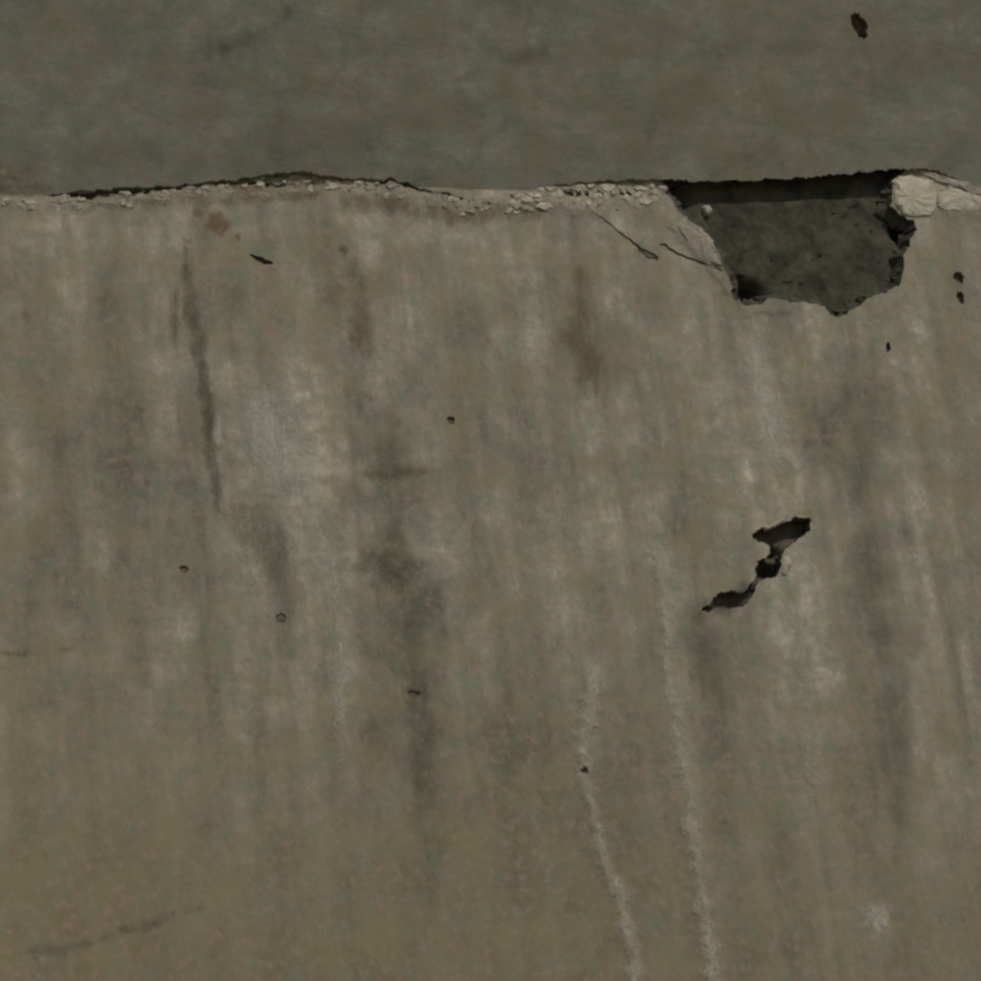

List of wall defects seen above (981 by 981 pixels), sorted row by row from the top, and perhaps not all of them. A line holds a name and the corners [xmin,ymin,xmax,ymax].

crack [0,174,514,217]
crack [585,207,723,271]
spalling [507,169,981,317]
water stain [168,235,451,935]
spalling [689,508,815,628]